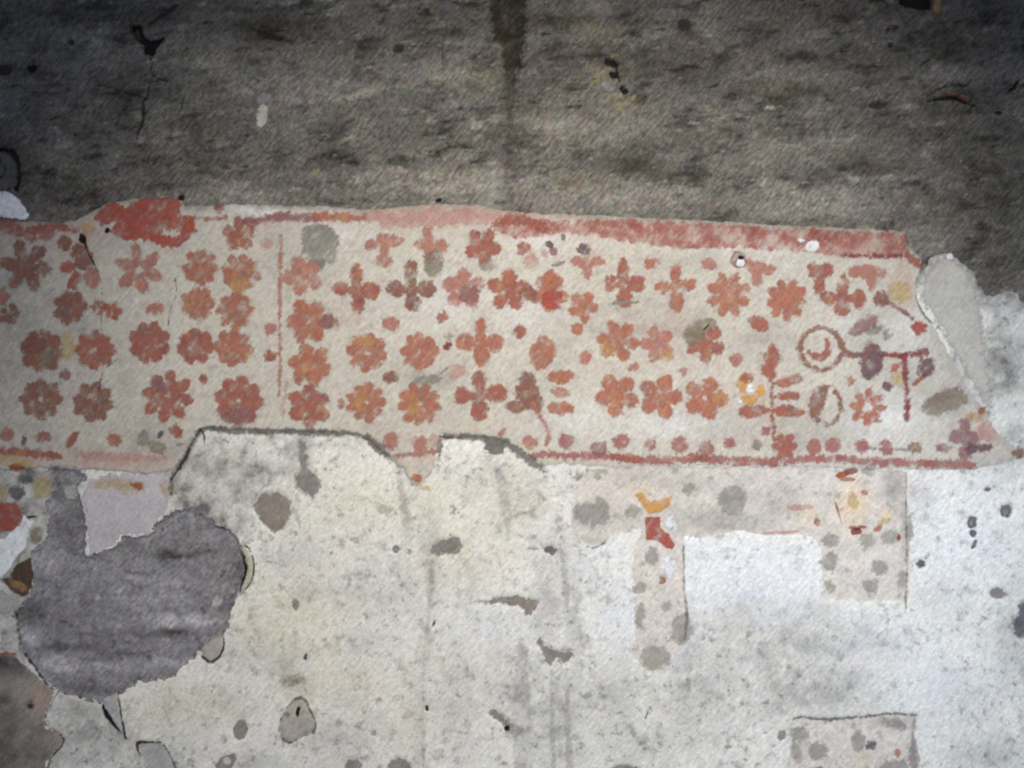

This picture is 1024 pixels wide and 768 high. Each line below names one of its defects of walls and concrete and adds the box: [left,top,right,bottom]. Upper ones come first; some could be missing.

damp [490,0,529,81]
crack [97,58,184,159]
peeling [168,426,390,497]
peeling [438,433,545,473]
flaking render [253,492,291,533]
flaking render [431,537,462,556]
flaking render [0,467,255,768]
flaking render [484,595,539,615]
flaking render [537,638,573,665]
flaking render [489,710,513,731]
spalling [345,759,362,768]
spalling [388,758,411,768]